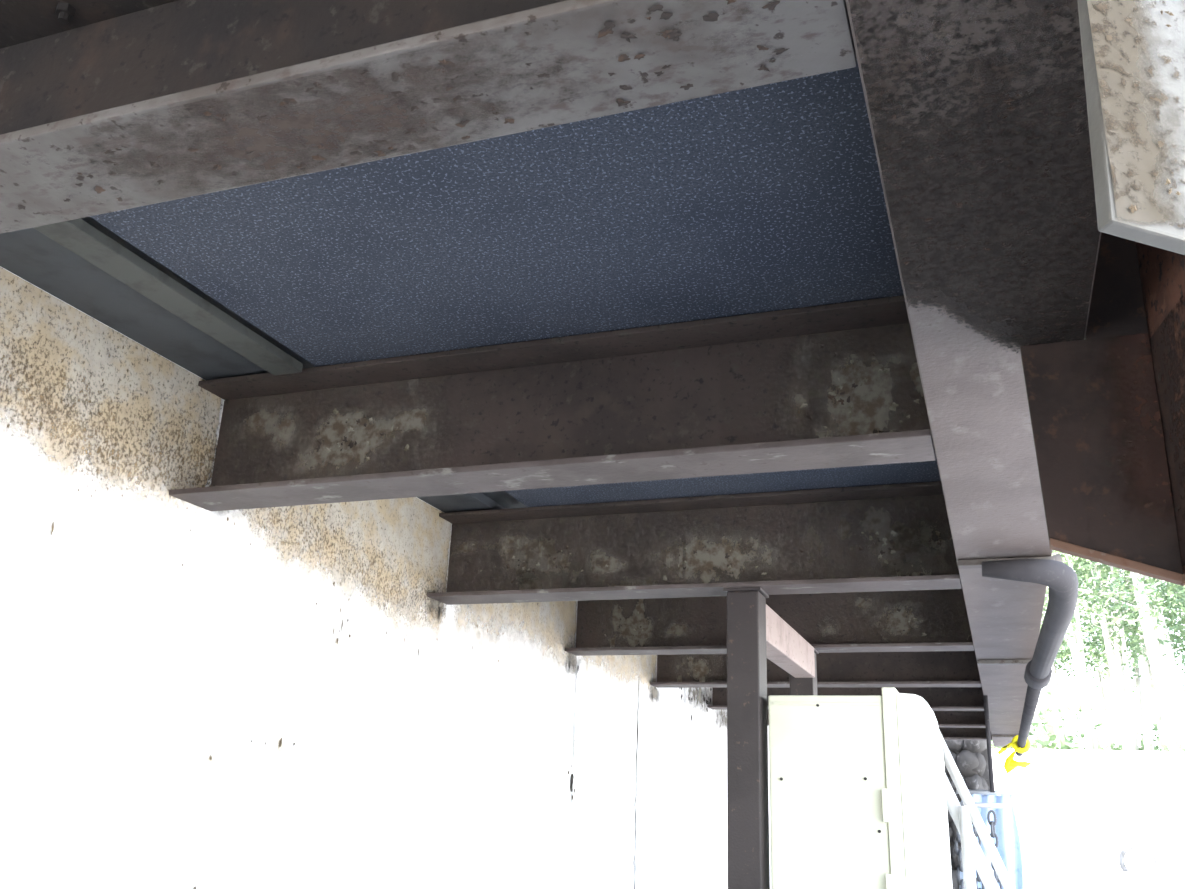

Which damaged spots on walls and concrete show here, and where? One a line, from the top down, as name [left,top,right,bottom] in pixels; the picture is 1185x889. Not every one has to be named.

corrosion [598,22,645,76]
corrosion [645,5,682,41]
corrosion [703,0,738,46]
corrosion [757,45,790,71]
corrosion [75,50,563,201]
corrosion [1091,333,1174,526]